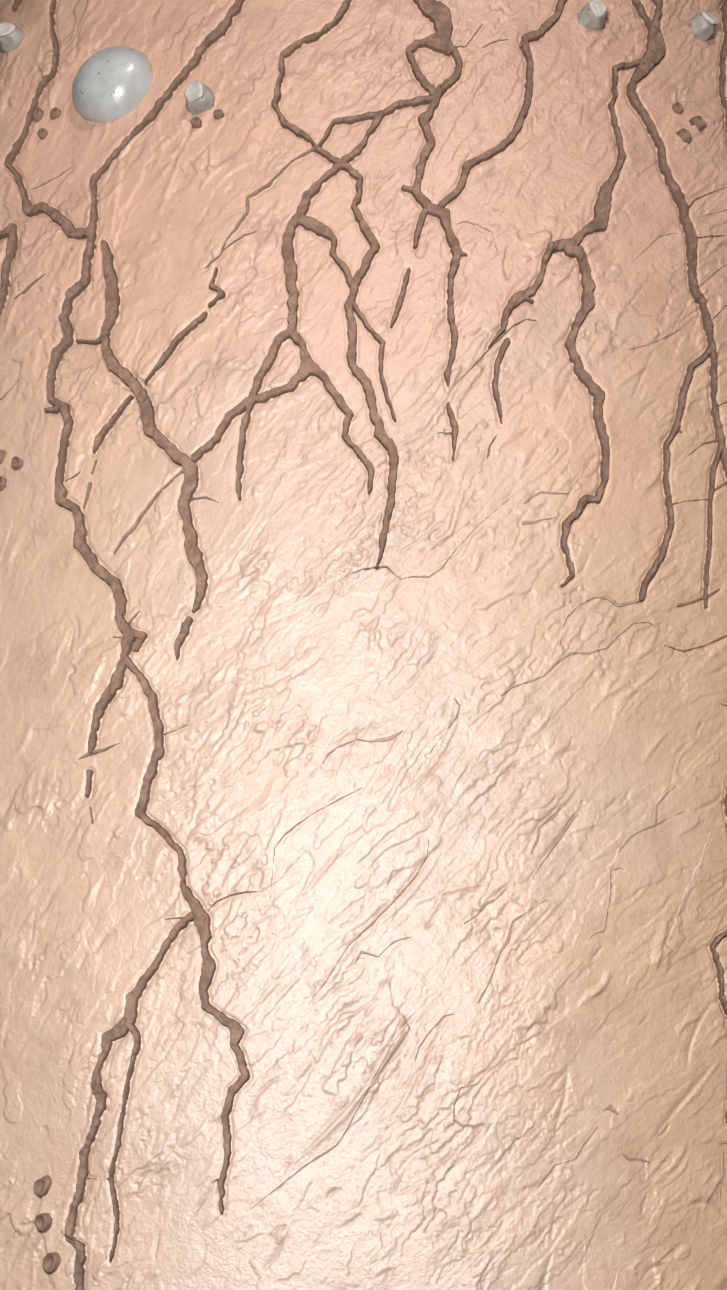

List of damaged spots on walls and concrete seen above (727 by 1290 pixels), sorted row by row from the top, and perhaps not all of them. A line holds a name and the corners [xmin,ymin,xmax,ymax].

crack [453,0,727,627]
crack [0,0,578,1290]
crack [501,622,655,696]
crack [664,634,727,652]
crack [719,787,727,828]
crack [587,786,684,940]
crack [709,929,727,1019]
crack [536,1105,618,1189]
crack [622,1153,667,1163]